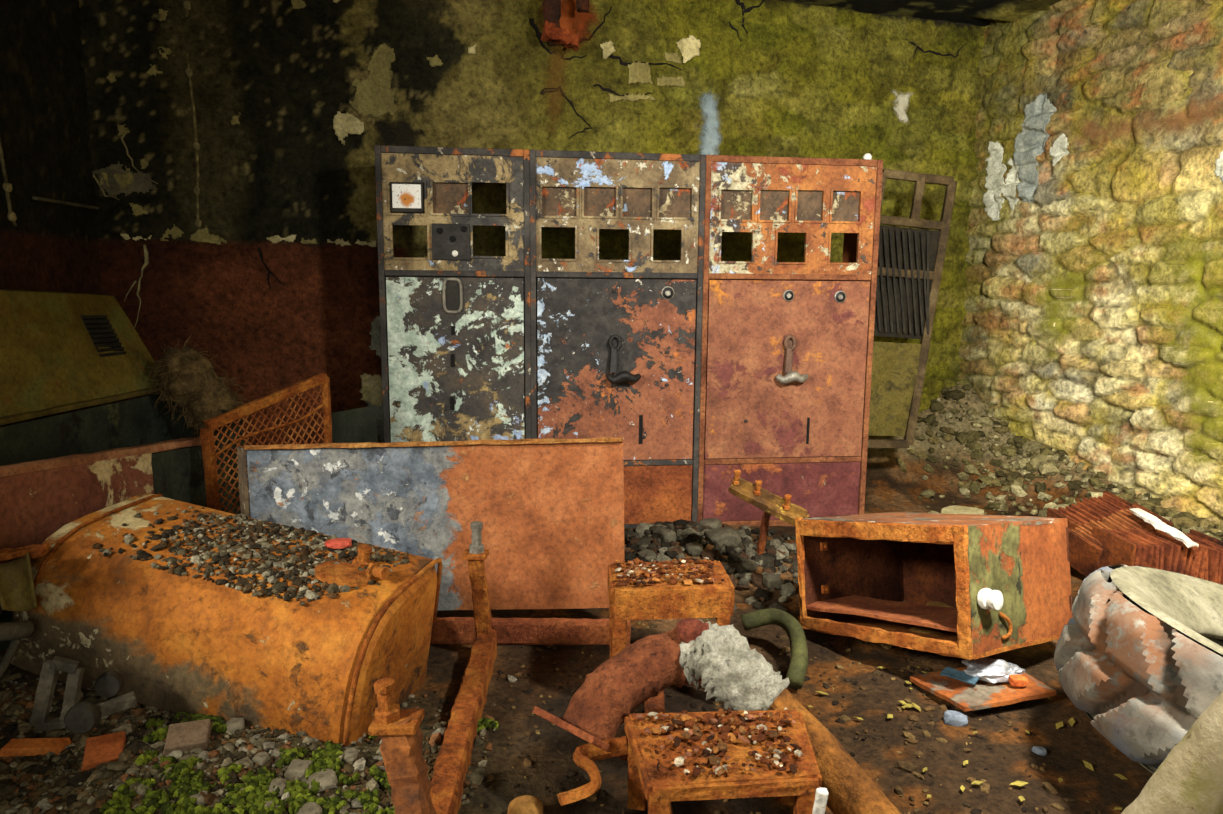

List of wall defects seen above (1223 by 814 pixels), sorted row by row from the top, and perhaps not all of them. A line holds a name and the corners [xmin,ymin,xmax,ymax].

corrosion [559,0,596,41]
spalling [426,55,443,67]
spalling [600,41,616,59]
spalling [608,35,701,103]
peeling [333,43,397,145]
water stain [374,115,424,146]
efflorescence [701,94,720,155]
water stain [893,91,910,122]
peeling [1013,94,1070,203]
spalling [92,124,158,216]
peeling [121,224,226,245]
peeling [266,235,376,247]